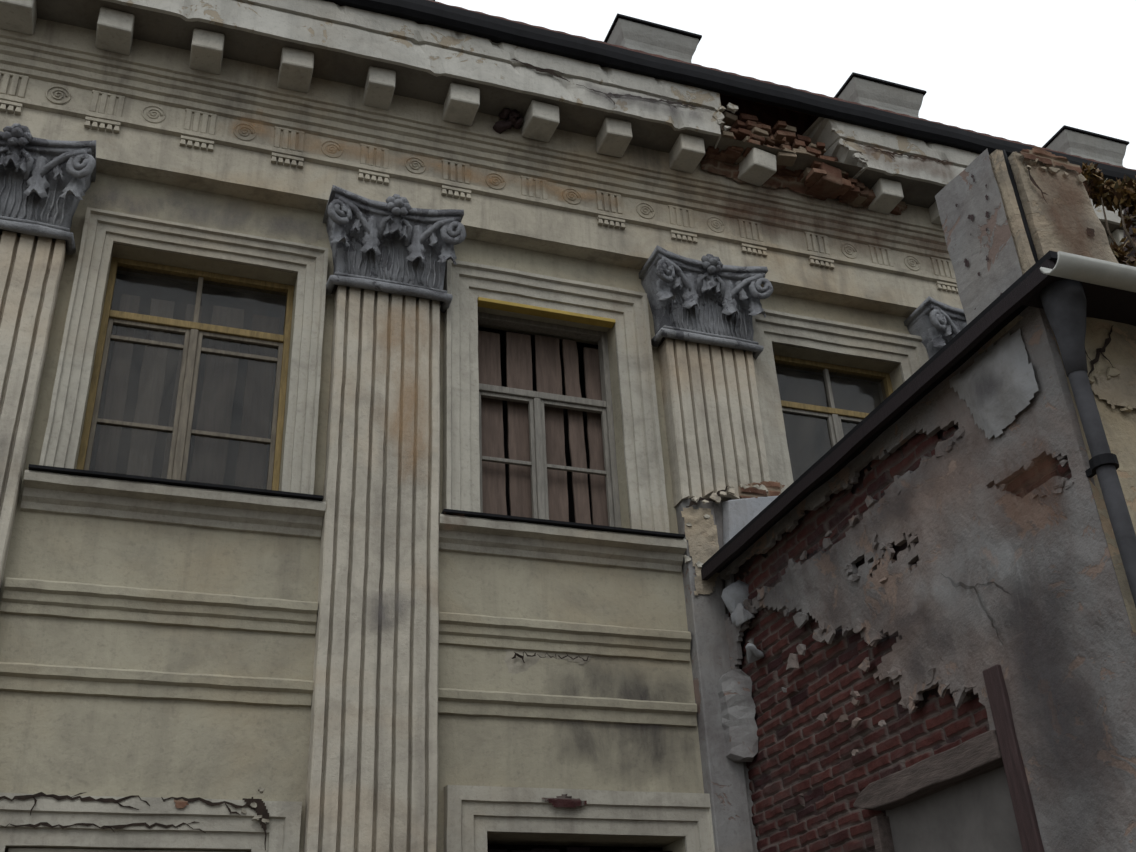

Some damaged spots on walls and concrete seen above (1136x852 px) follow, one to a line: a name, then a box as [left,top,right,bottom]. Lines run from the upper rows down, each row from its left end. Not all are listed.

spalling [700,102,876,209]
flaking render [1015,146,1086,184]
spalling [1000,456,1074,499]
peeling [681,481,785,595]
flaking render [729,426,990,852]
crack [0,788,270,850]